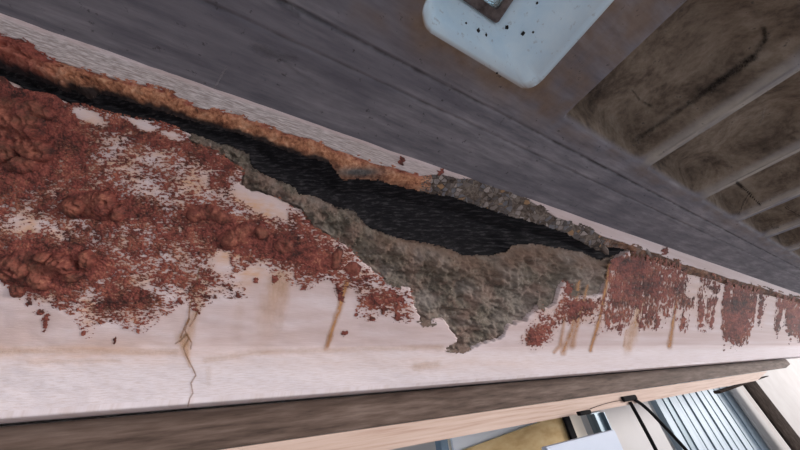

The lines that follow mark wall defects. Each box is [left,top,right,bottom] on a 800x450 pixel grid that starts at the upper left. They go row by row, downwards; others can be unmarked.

peeling [0,33,800,354]
crack [177,268,200,404]
corrosion [327,280,349,346]
corrosion [589,264,610,352]